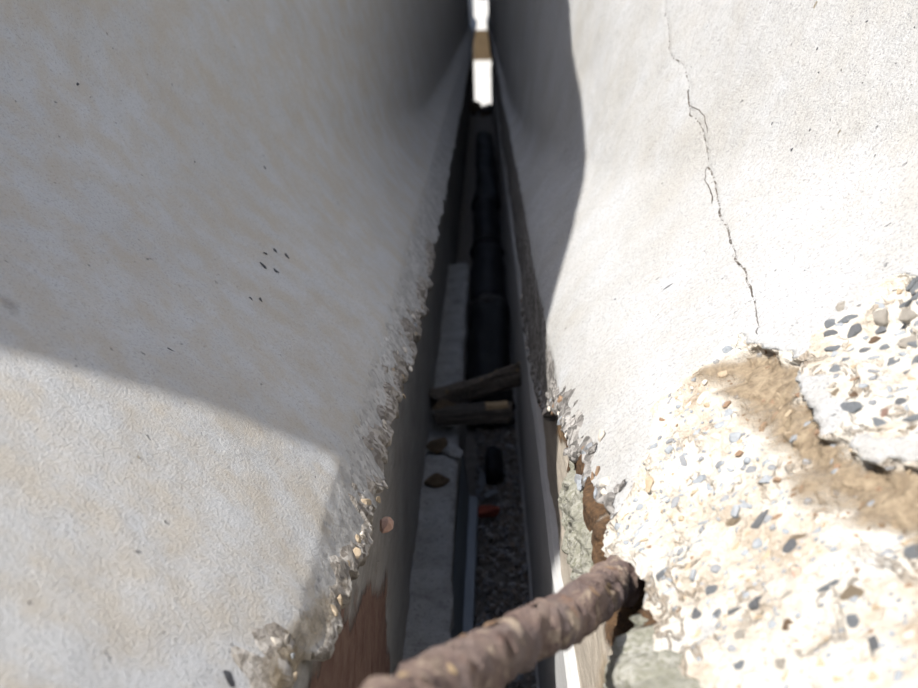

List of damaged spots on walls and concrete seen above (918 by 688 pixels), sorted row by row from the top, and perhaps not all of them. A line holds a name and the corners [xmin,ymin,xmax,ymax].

crack [665,7,759,334]
spalling [223,237,436,688]
rust [604,594,658,647]
spalling [361,273,918,688]